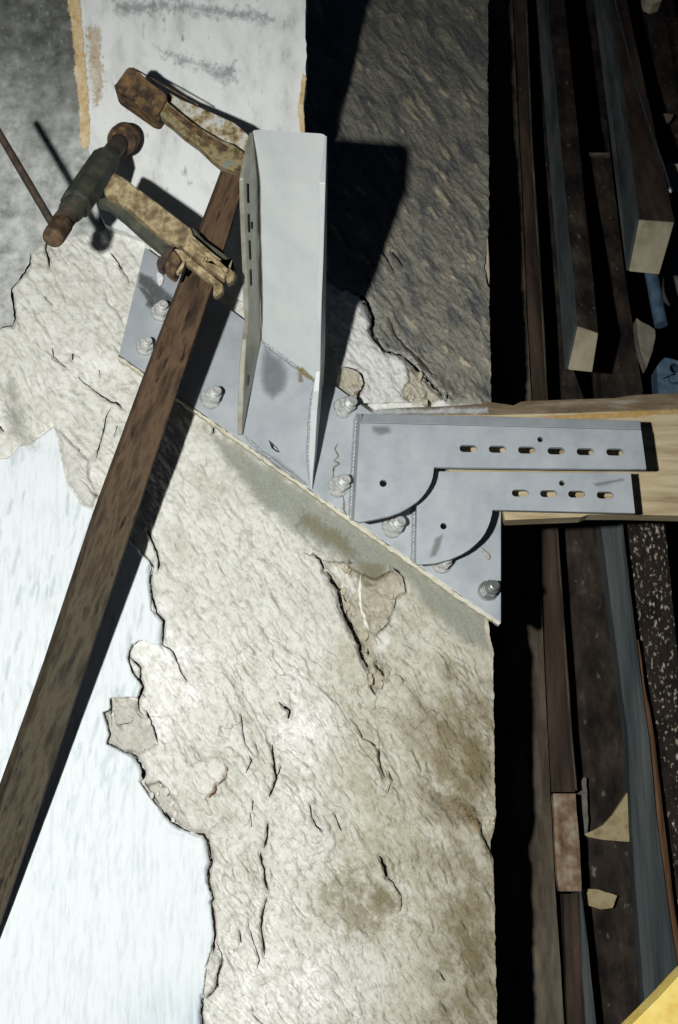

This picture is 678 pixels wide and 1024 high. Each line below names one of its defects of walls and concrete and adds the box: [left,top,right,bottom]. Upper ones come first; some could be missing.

crack [52,348,122,457]
spalling [337,368,365,397]
damp [215,438,485,644]
spalling [325,562,405,691]
spalling [105,697,155,754]
spalling [145,782,188,827]
peeling [188,758,226,794]
crack [358,729,393,791]
spalling [478,815,495,837]
crack [379,856,402,912]